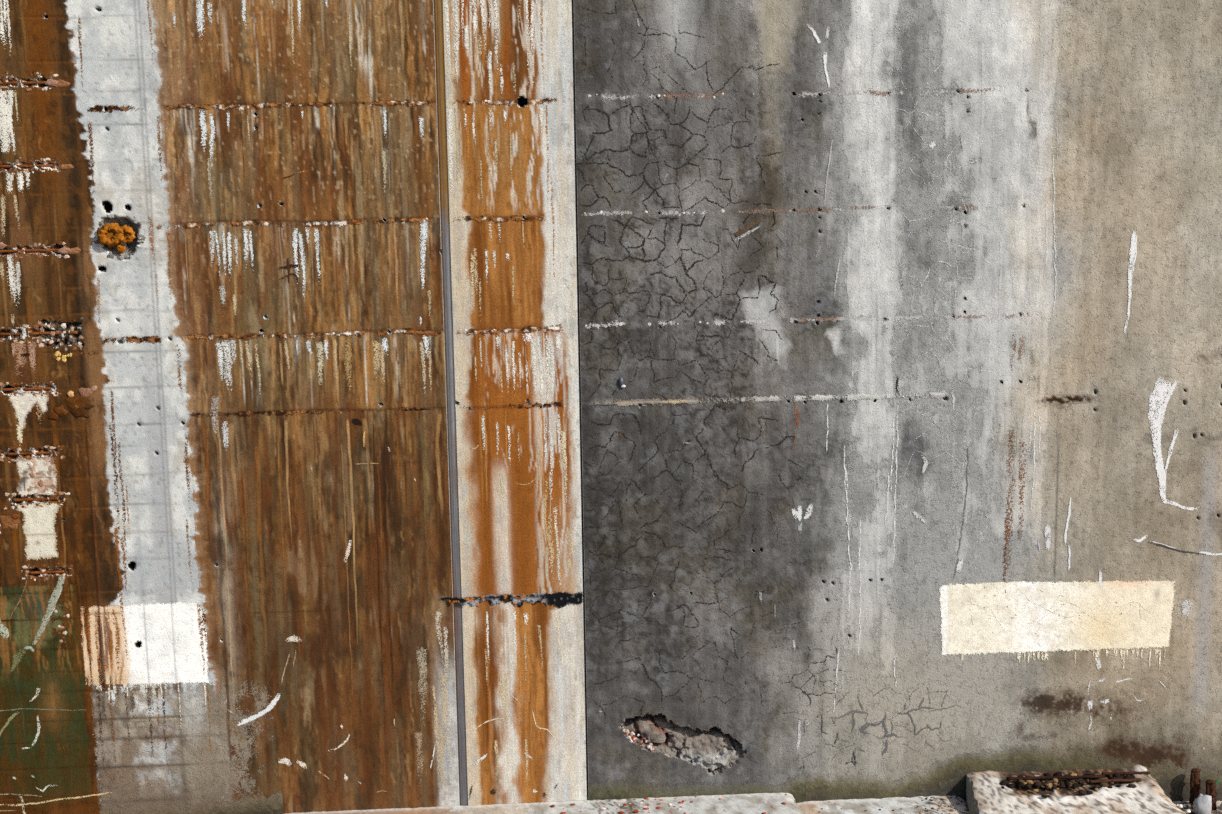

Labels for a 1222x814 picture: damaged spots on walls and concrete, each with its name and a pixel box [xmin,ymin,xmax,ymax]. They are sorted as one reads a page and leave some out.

efflorescence [0,0,12,52]
efflorescence [0,89,18,154]
water stain [447,108,512,203]
efflorescence [0,171,30,237]
efflorescence [0,254,21,326]
efflorescence [8,341,59,560]
corrosion [0,0,130,814]
corrosion [147,0,586,814]
water stain [475,333,562,400]
crack [79,1,965,768]
water stain [537,0,1061,787]
spalling [619,713,757,776]